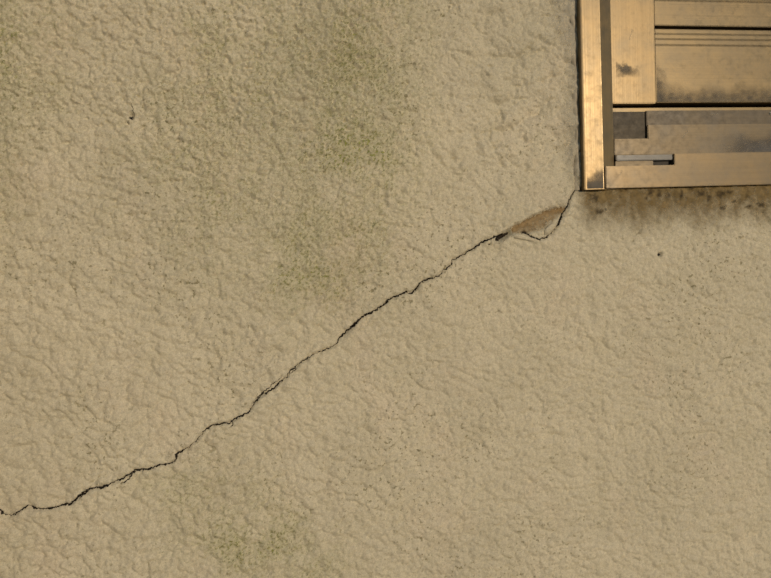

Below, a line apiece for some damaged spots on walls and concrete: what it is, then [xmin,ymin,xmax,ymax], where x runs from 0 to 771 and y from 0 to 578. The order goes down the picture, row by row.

spalling [488,207,565,245]
crack [527,190,575,240]
crack [0,233,503,516]